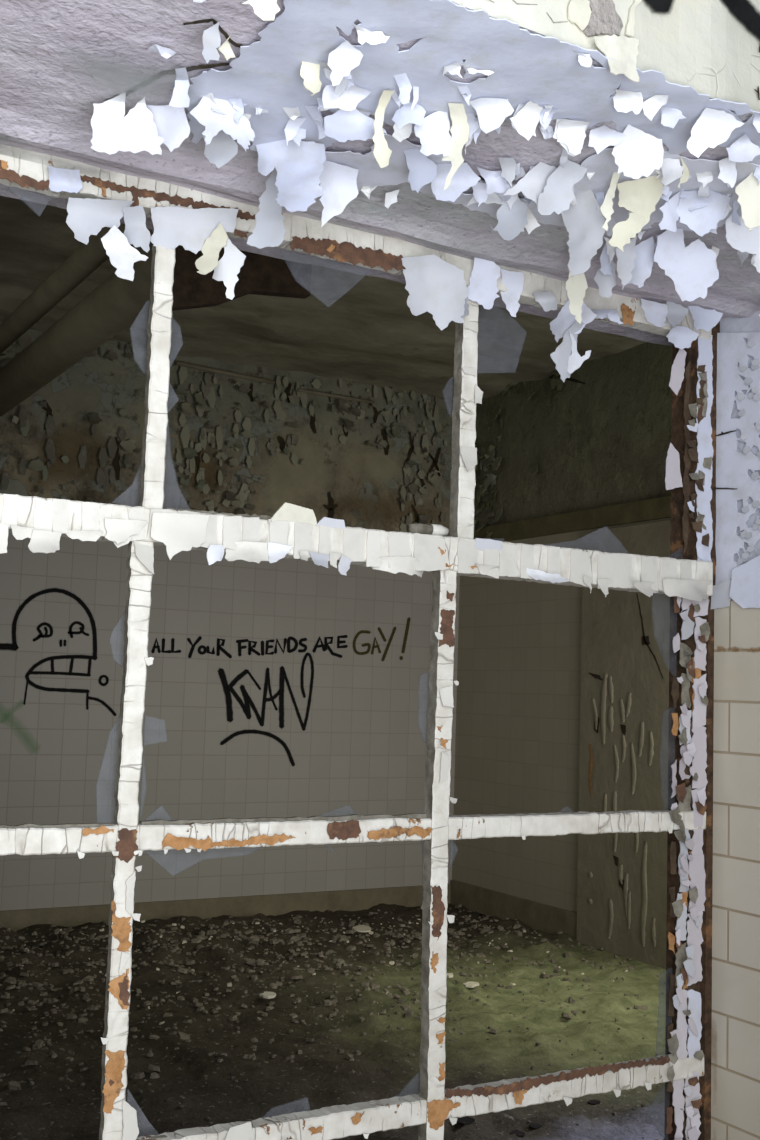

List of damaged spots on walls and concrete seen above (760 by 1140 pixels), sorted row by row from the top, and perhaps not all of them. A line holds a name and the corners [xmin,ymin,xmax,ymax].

crack [489,0,568,23]
corrosion [0,160,50,191]
corrosion [80,175,255,238]
corrosion [290,236,406,272]
peeling [0,0,760,708]
corrosion [82,825,138,863]
corrosion [327,820,433,840]
peeling [125,850,143,922]
peeling [667,703,707,1140]
corrosion [427,1056,670,1130]
peeling [122,1100,139,1140]
peeling [225,1122,253,1140]